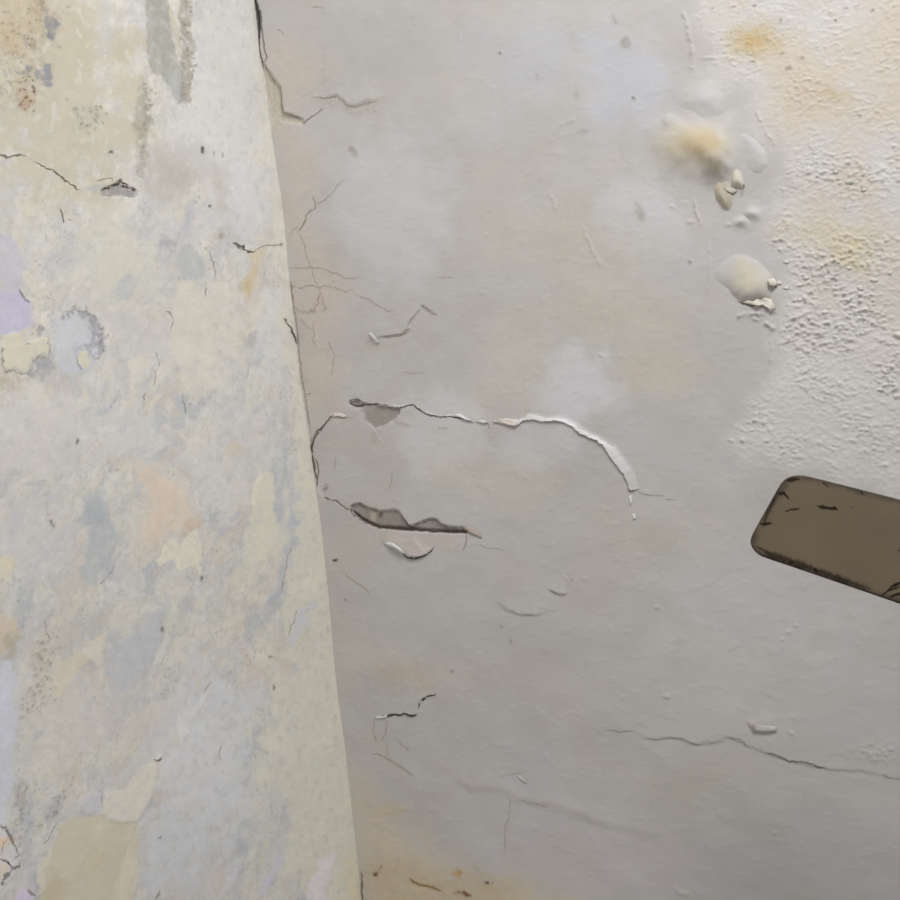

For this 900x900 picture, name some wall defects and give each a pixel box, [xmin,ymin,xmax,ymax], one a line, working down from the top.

crack [254,0,284,83]
crack [0,154,80,190]
peeling [0,231,111,397]
crack [205,180,676,520]
spalling [348,398,415,447]
spalling [349,502,505,560]
crack [372,694,436,777]
crack [608,729,747,747]
crack [768,753,828,769]